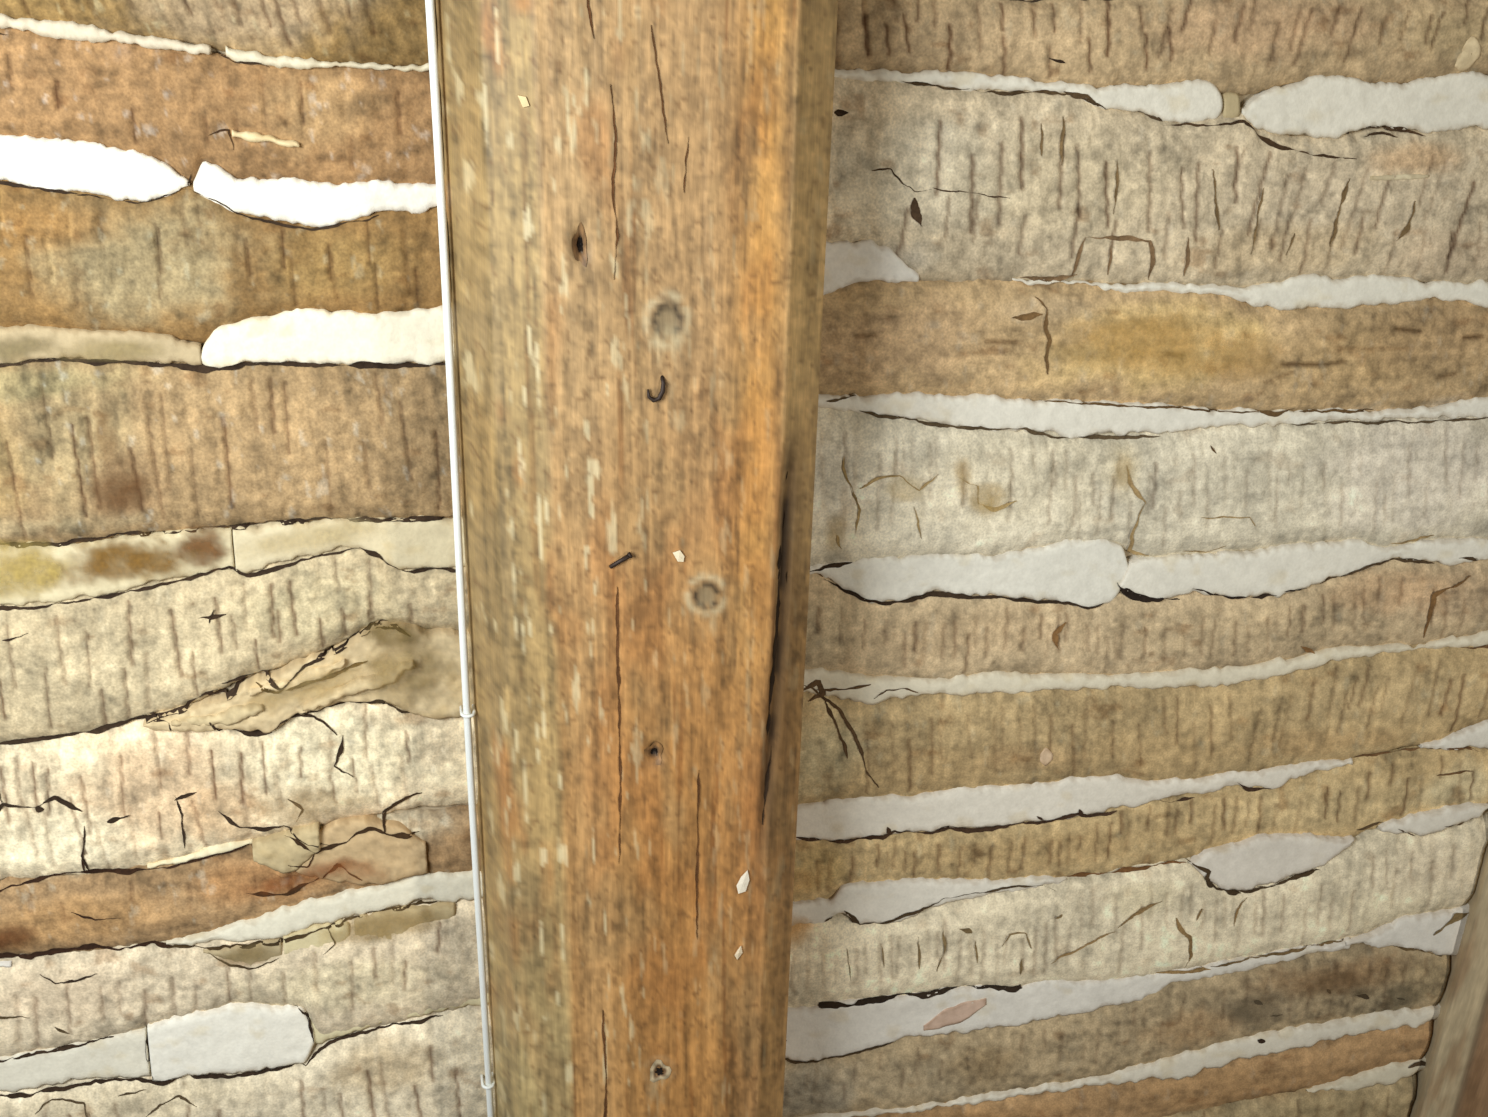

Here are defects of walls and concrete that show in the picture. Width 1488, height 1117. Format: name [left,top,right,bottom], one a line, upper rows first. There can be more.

peeling [834,36,1488,139]
peeling [0,135,437,227]
peeling [0,305,454,368]
peeling [818,391,1488,439]
peeling [0,515,465,606]
peeling [810,537,1488,609]
crack [0,619,410,777]
peeling [796,748,1353,841]
crack [0,792,437,984]
peeling [785,902,1470,1062]
peeling [0,1002,382,1093]
crack [0,1005,442,1117]